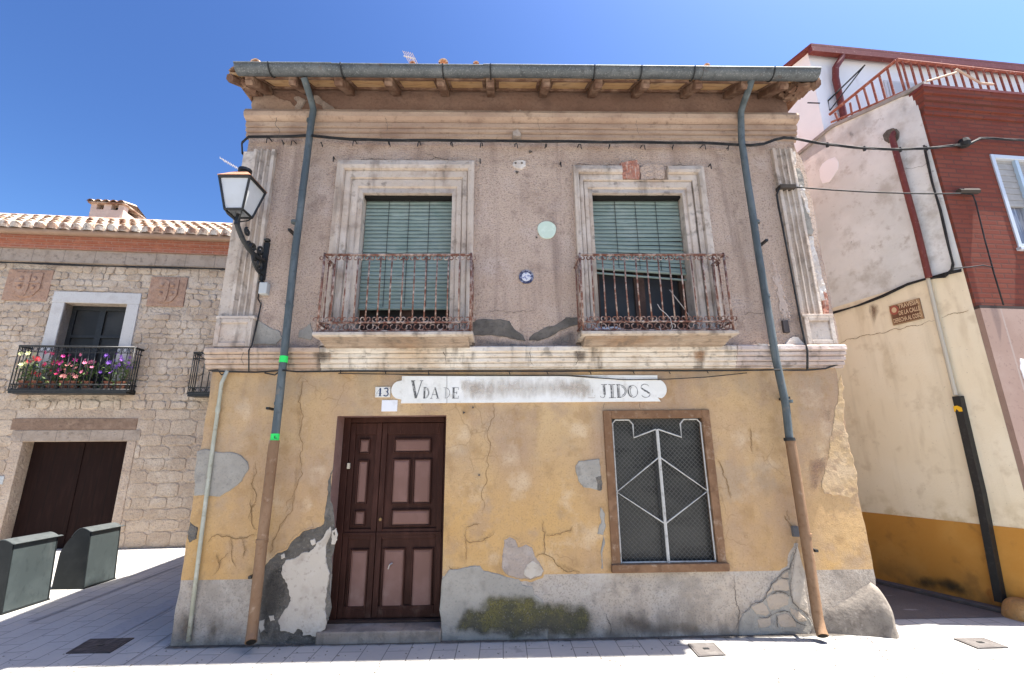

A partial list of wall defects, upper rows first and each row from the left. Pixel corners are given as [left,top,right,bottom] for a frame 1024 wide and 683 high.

flaking render [620,160,665,180]
crack [207,381,308,573]
flaking render [259,464,338,644]
crack [449,407,495,570]
flaking render [499,535,546,582]
flaking render [821,374,858,498]